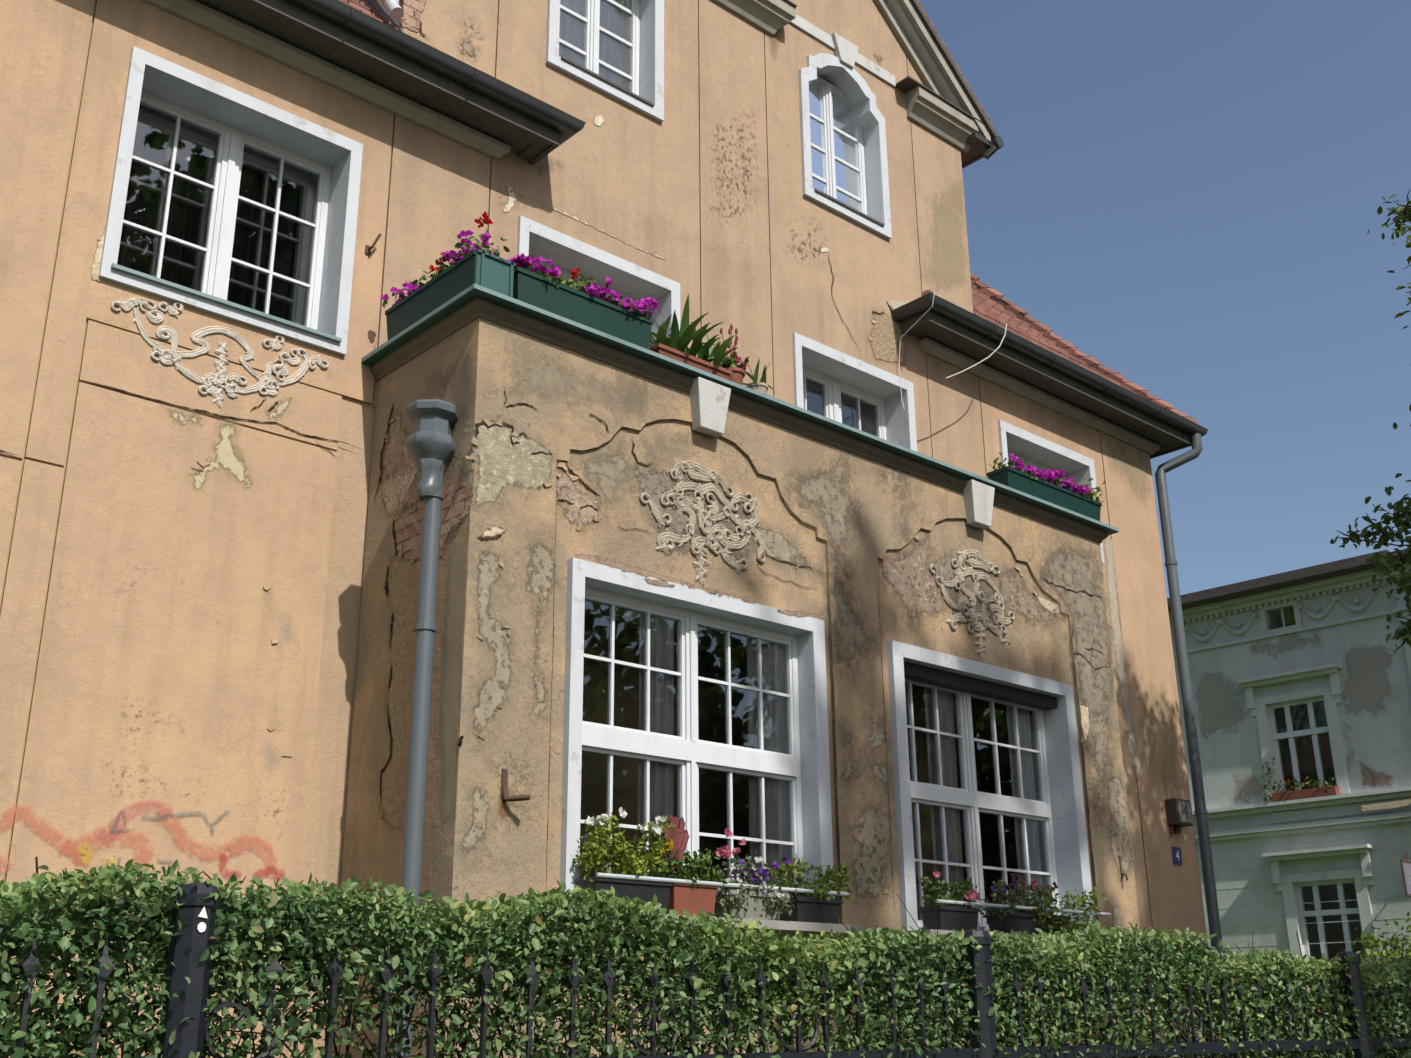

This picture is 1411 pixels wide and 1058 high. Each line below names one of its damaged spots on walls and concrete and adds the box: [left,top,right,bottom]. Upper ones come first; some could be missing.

flaking render [401,0,426,32]
crack [828,256,885,350]
peeling [191,423,251,489]
spalling [381,414,423,565]
spalling [439,418,602,558]
spalling [1080,705,1090,740]
spalling [1105,539,1140,780]
peeling [1196,674,1243,738]
peeling [1342,646,1392,729]
flaking render [1349,751,1411,811]